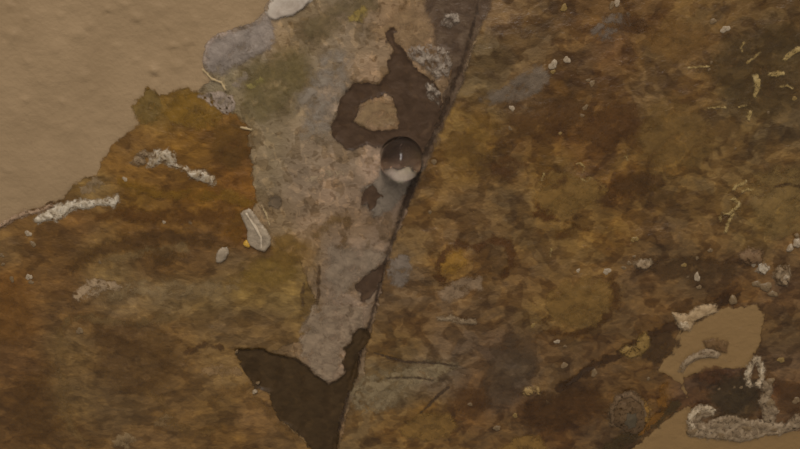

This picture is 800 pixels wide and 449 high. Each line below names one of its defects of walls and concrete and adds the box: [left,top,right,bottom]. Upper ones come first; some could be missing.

damp [0,87,316,449]
peeling [198,0,454,449]
crack [357,0,490,413]
damp [338,0,800,449]